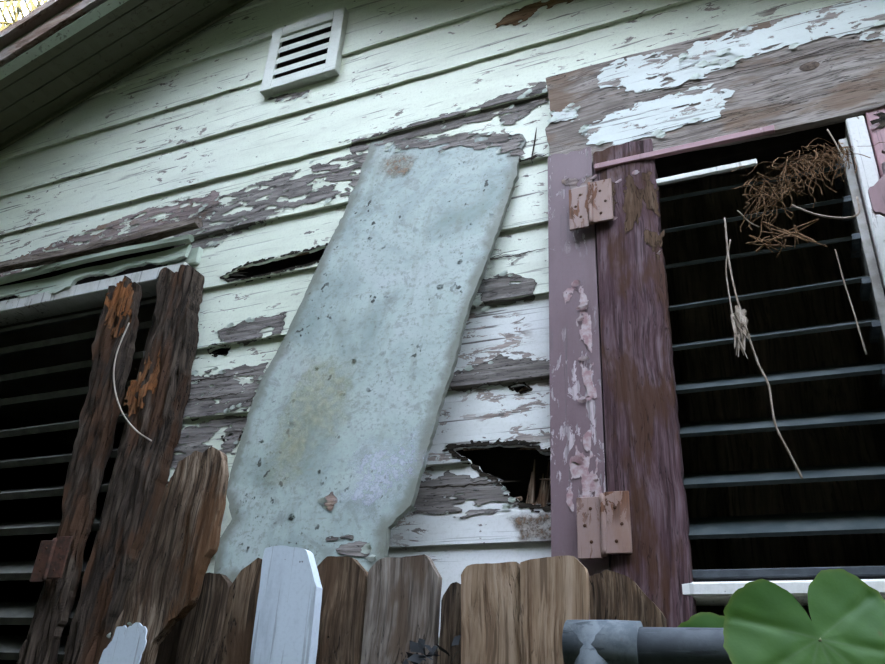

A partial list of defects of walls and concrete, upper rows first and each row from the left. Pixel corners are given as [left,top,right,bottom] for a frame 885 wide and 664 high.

peeling [0,0,885,277]
spalling [220,243,328,286]
peeling [472,270,537,312]
peeling [170,311,287,469]
peeling [449,354,550,394]
peeling [563,280,597,403]
peeling [410,438,551,519]
peeling [566,430,602,512]